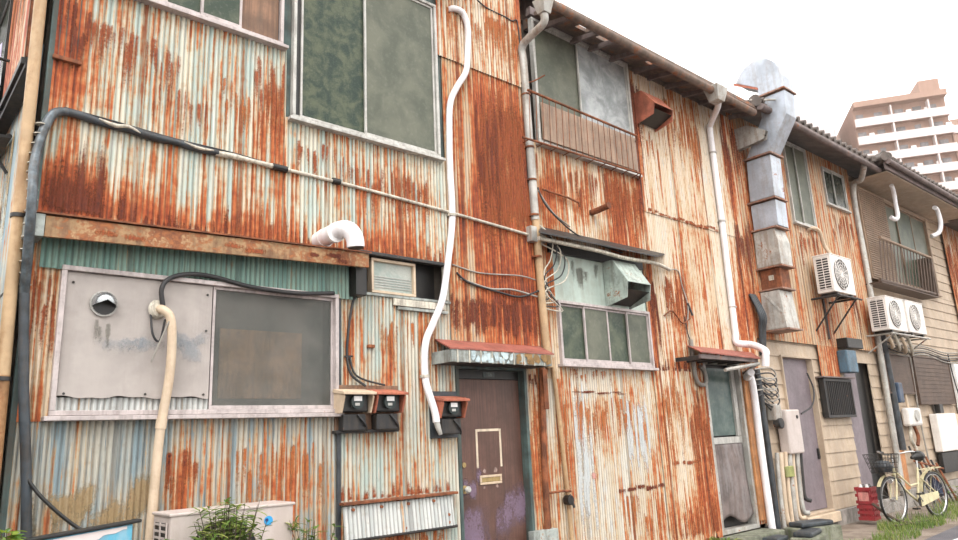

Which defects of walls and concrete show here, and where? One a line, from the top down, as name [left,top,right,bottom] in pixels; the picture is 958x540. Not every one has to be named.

rust [60,0,208,131]
rust [220,57,285,146]
rust [42,141,347,264]
rust [297,141,429,216]
rust [474,81,719,250]
rust [734,221,755,304]
rust [451,293,539,338]
rust [645,273,688,348]
rust [166,450,199,503]
rust [236,442,325,503]
rust [557,368,633,501]
rust [619,361,720,540]